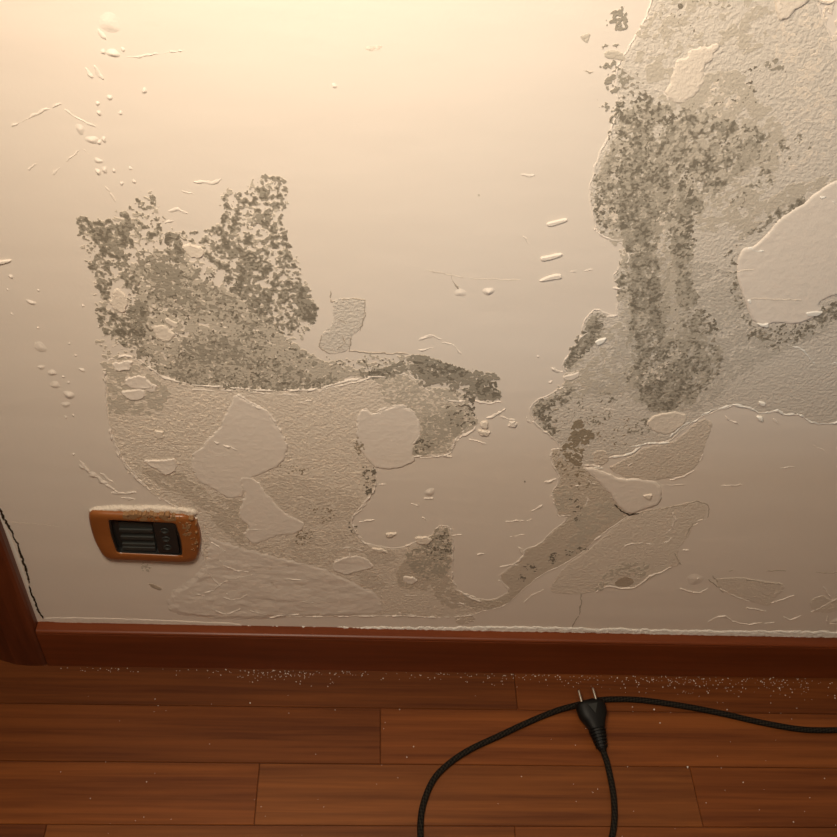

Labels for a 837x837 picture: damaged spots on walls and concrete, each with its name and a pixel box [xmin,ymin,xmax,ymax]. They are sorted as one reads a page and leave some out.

crack [0,508,44,618]
damp [76,174,502,456]
peeling [103,0,837,619]
damp [532,0,837,564]